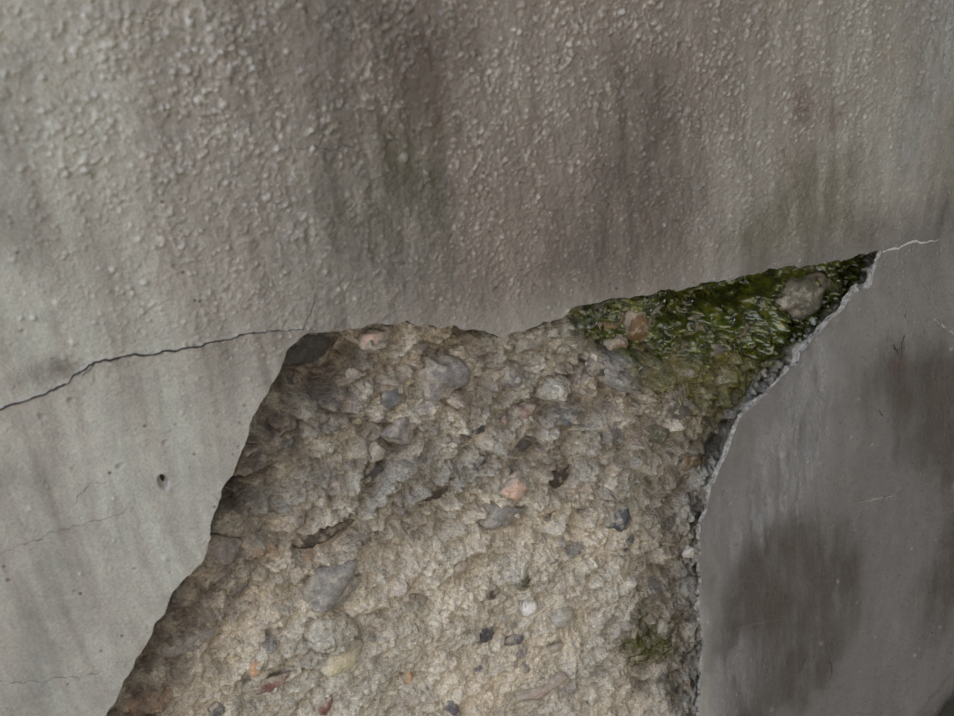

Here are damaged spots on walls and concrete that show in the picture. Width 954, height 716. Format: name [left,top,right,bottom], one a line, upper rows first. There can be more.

crack [0,296,315,411]
spalling [107,251,881,716]